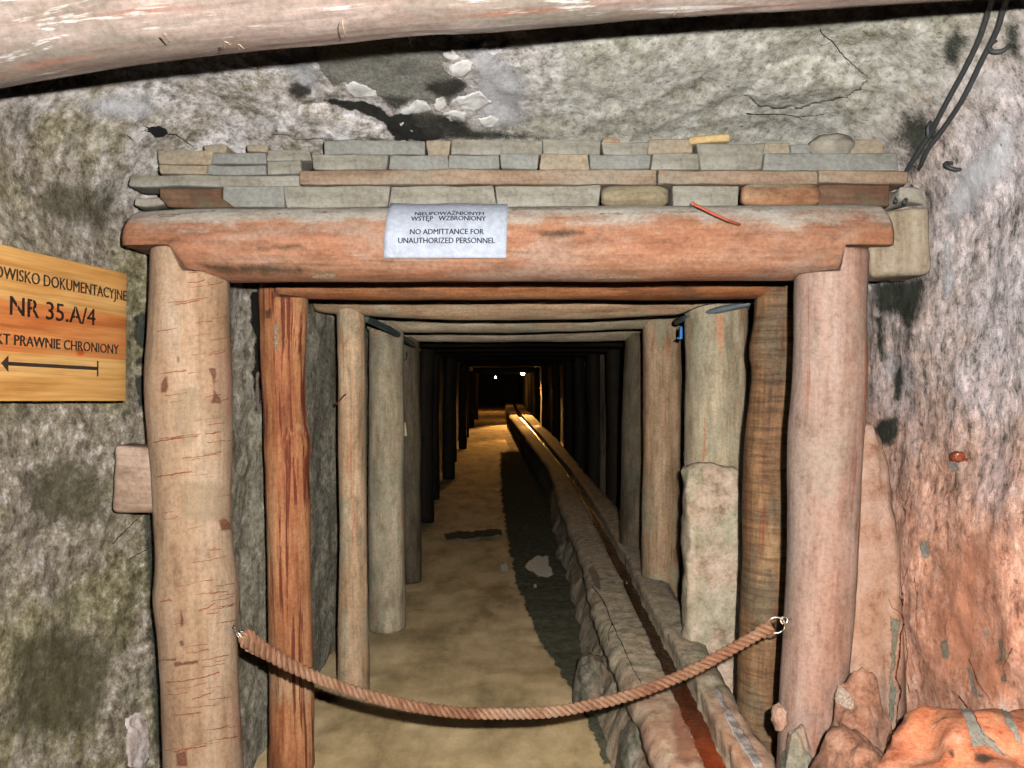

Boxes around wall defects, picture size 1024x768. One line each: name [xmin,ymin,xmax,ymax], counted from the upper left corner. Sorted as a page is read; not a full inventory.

crack [820,29,869,78]
peeling [316,35,499,132]
crack [746,113,824,121]